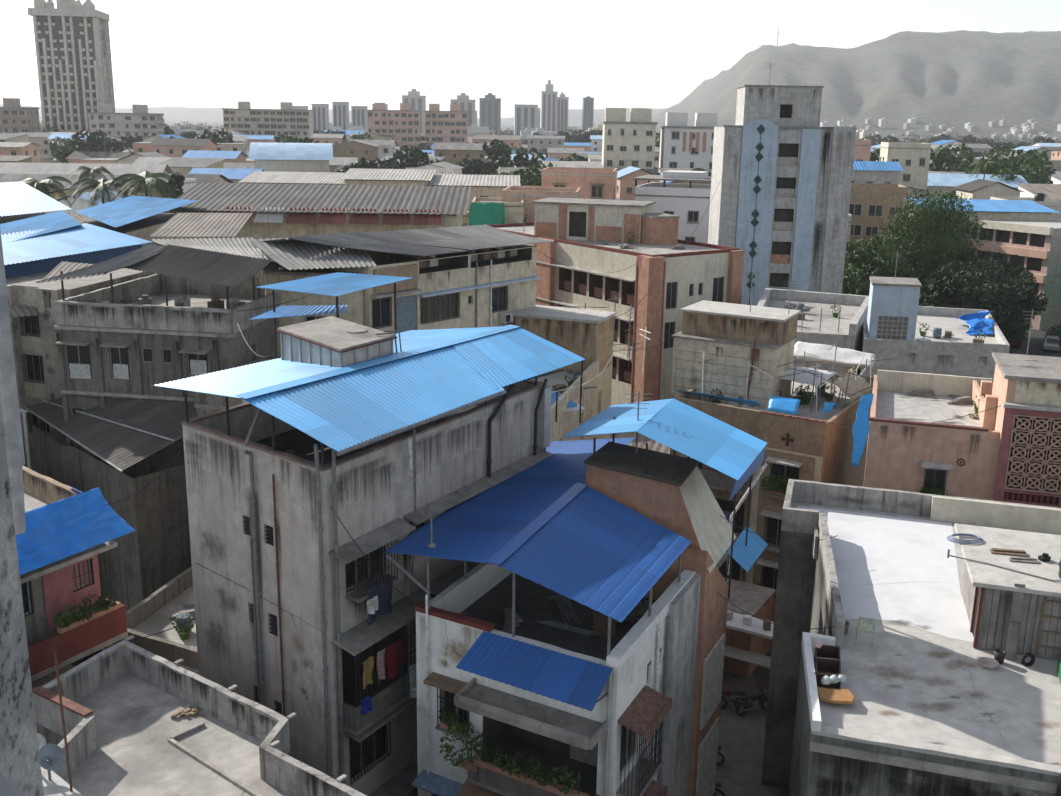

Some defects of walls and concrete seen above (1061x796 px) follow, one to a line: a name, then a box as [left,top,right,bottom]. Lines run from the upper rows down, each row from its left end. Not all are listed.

water stain [822,133,830,198]
water stain [813,224,822,275]
water stain [249,496,262,589]
water stain [162,666,207,697]
water stain [819,756,1036,796]